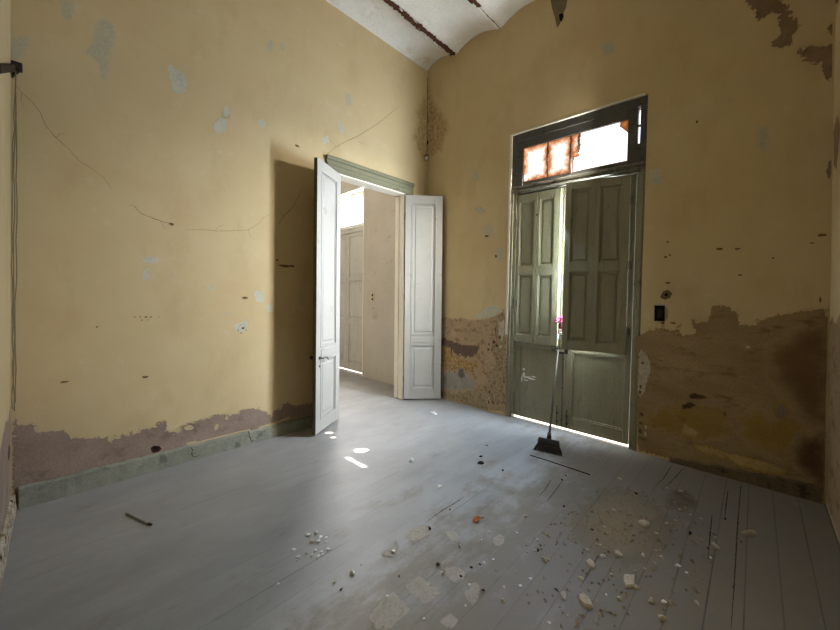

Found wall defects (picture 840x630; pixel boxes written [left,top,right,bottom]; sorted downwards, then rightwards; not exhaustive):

rust [383,0,456,58]
peeling [745,0,833,81]
peeling [0,402,312,537]
peeling [441,304,508,412]
leakage [637,318,827,499]
peeling [634,297,840,540]